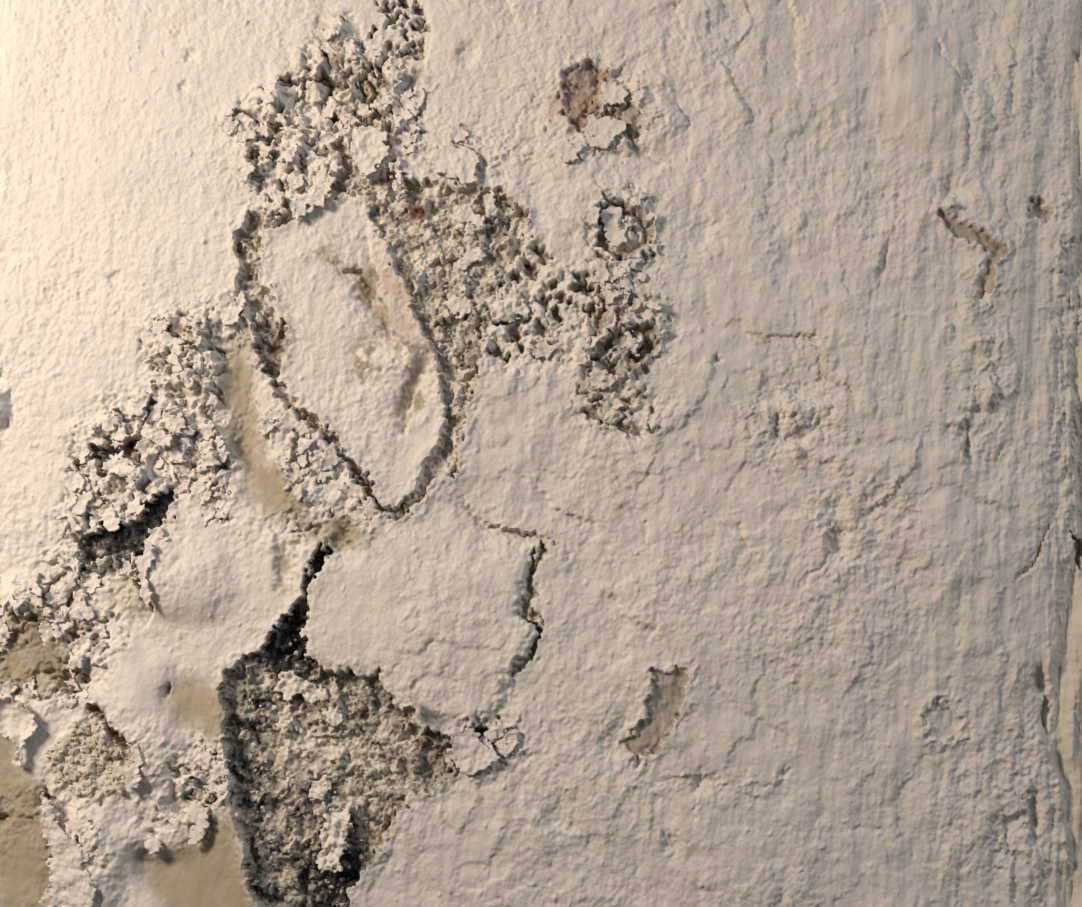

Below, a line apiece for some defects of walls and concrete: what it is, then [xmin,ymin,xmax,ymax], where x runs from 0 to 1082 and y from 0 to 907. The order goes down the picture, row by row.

spalling [0,0,677,907]
crack [507,527,561,678]
peeling [620,666,689,757]